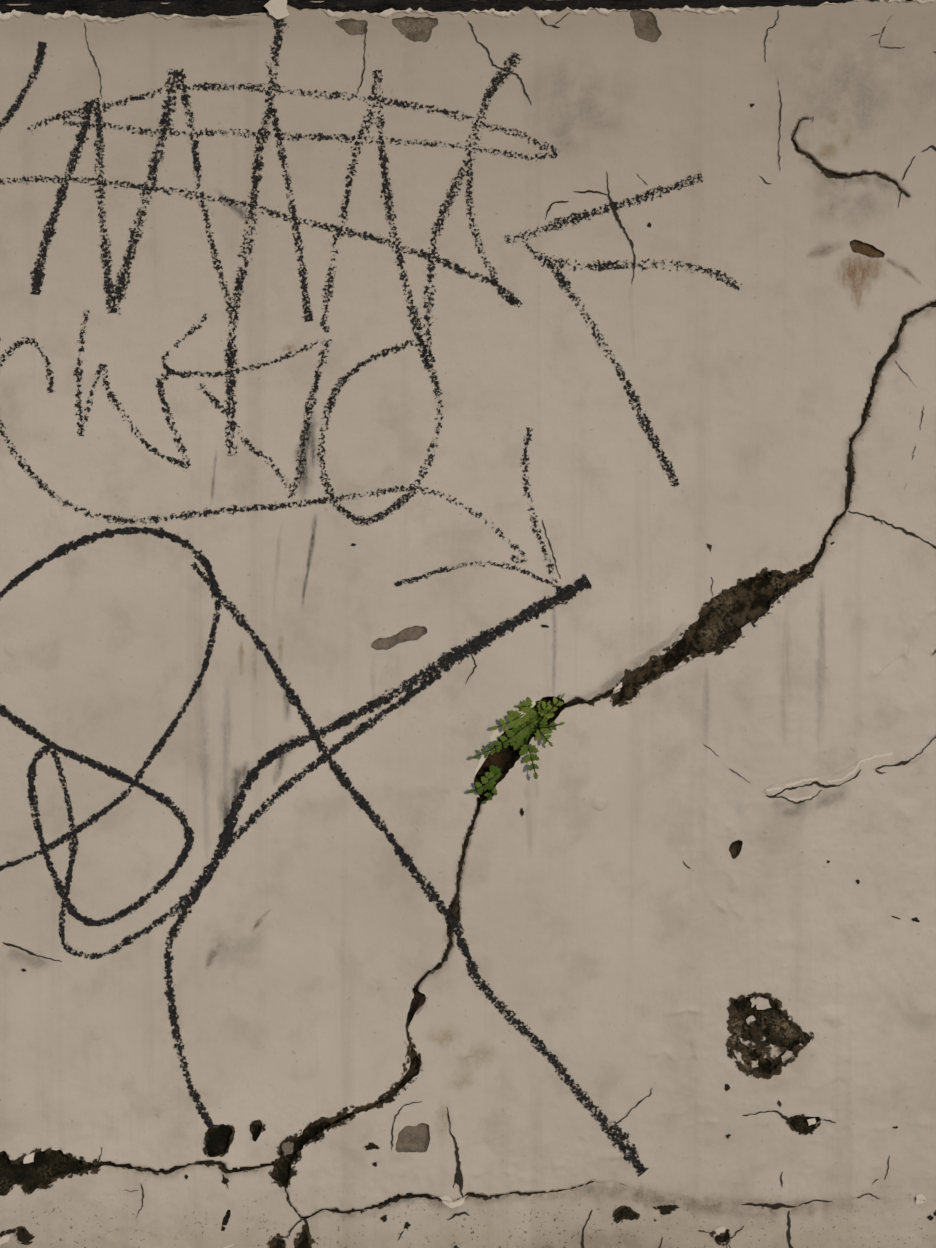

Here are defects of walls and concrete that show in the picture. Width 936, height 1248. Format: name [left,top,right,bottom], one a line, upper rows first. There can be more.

crack [760,10,936,207]
crack [800,301,936,573]
crack [542,519,561,579]
spalling [371,626,427,650]
crack [565,689,614,708]
crack [414,798,482,991]
crack [405,1022,413,1045]
spalling [726,992,814,1079]
crack [607,1089,652,1132]
crack [743,1100,789,1122]
spalling [0,1148,106,1196]
crack [97,1101,624,1248]